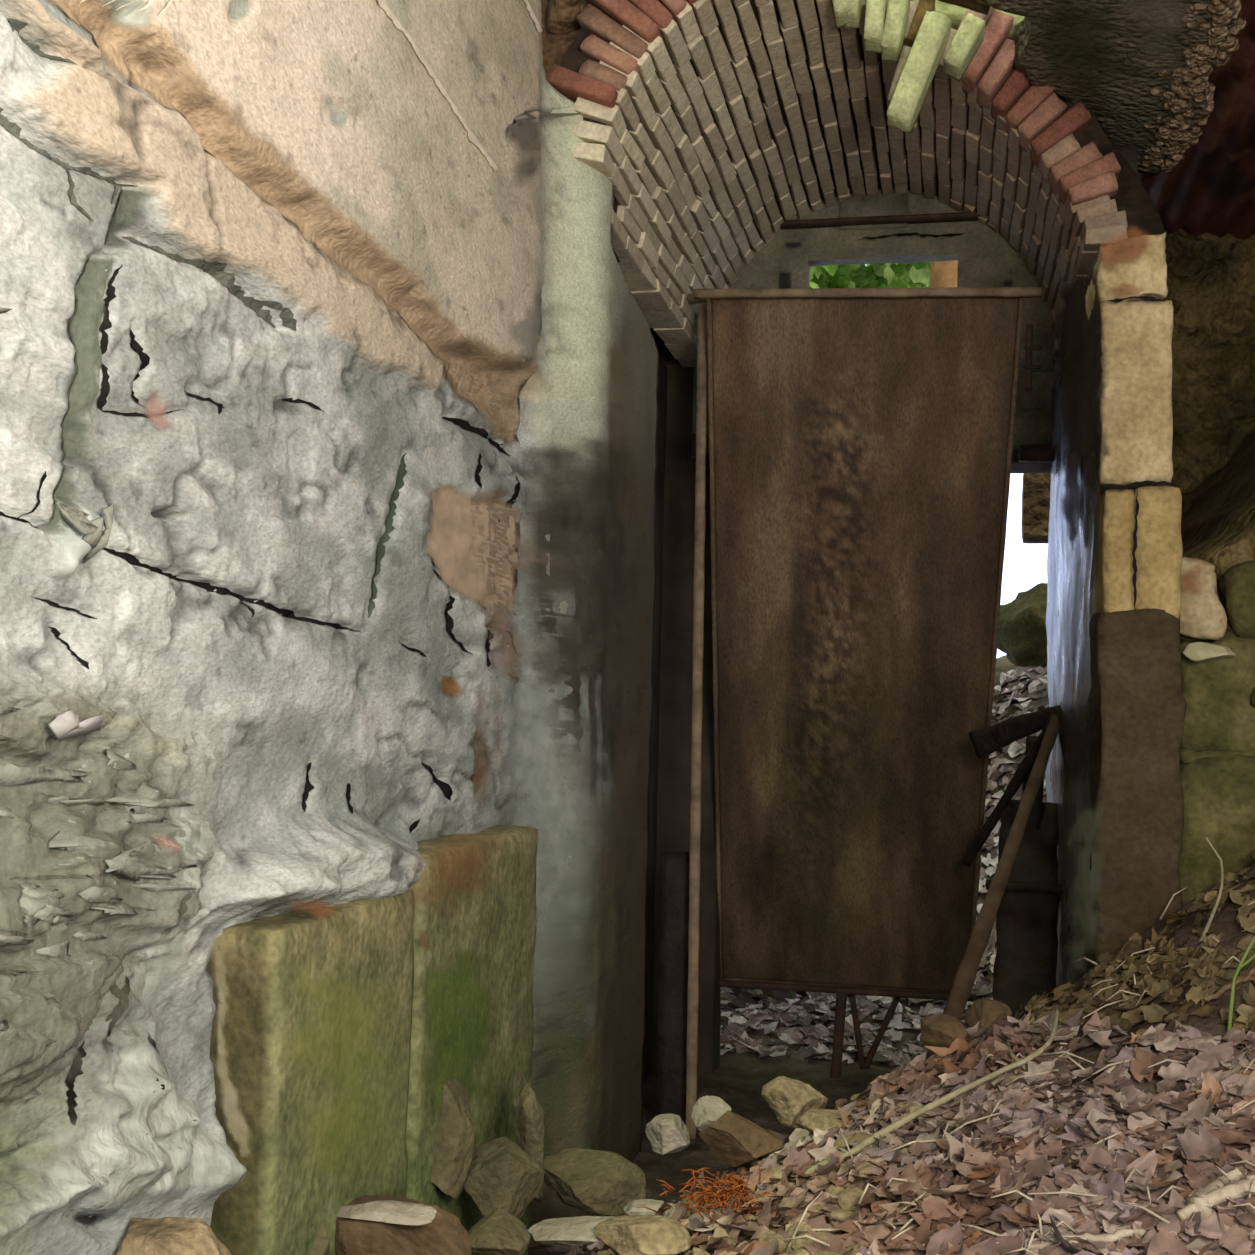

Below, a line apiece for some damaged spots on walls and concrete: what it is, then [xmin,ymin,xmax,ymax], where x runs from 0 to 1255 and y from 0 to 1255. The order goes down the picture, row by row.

crack [0,107,137,221]
spalling [51,0,533,442]
crack [97,236,297,418]
crack [0,471,47,528]
crack [103,453,407,631]
peeling [426,486,520,611]
damp [535,404,627,748]
damp [1054,273,1109,577]
crack [1100,480,1175,608]
damp [1058,699,1096,799]
spalling [0,704,198,1102]
spalling [214,940,249,1154]